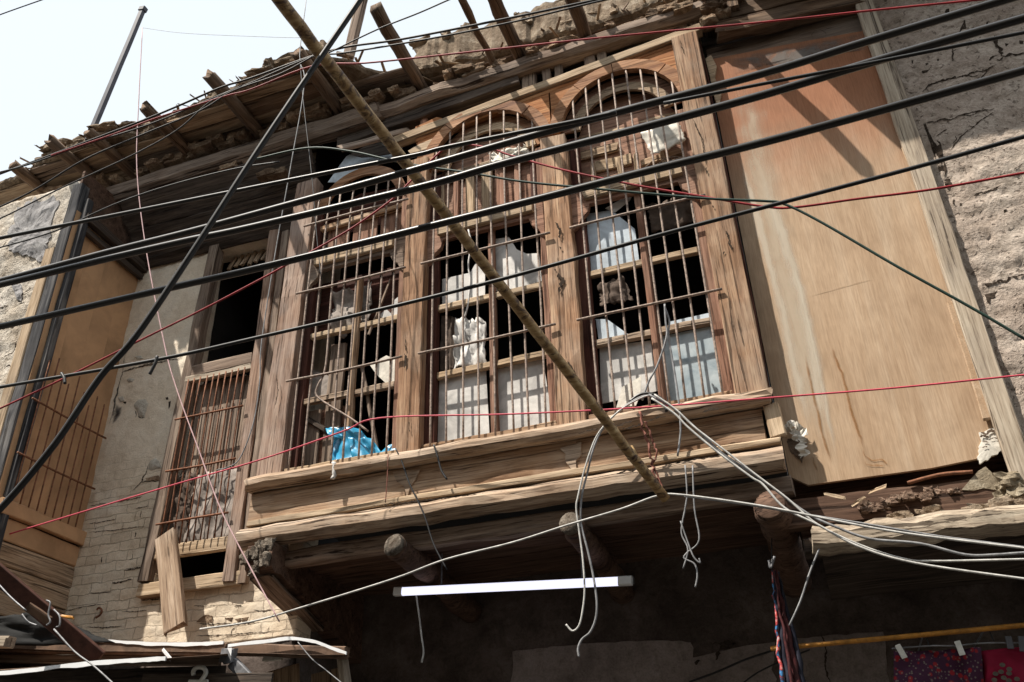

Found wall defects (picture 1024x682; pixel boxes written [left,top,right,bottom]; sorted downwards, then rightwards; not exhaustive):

crack [923,35,1024,91]
crack [923,109,993,152]
peeling [7,195,60,263]